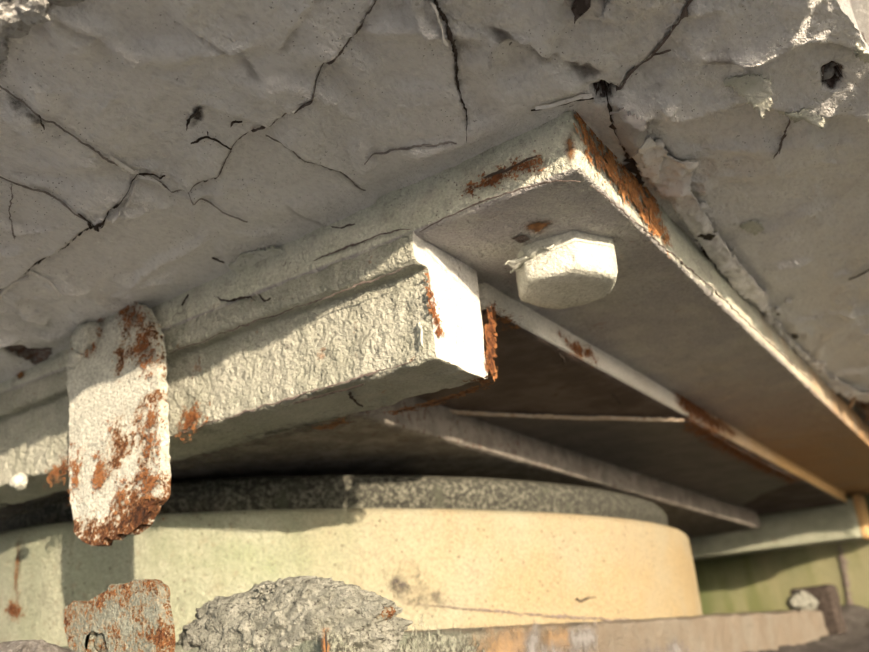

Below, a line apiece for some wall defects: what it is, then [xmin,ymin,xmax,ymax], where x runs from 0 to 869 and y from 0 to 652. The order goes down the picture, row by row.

spalling [0,0,85,64]
crack [0,0,376,300]
crack [430,0,468,143]
corrosion [456,150,545,200]
crack [571,0,591,24]
corrosion [566,111,673,259]
crack [616,0,693,91]
flaking render [723,73,825,129]
spalling [632,136,869,403]
corrosion [67,302,160,385]
corrosion [388,300,529,415]
corrosion [45,395,211,521]